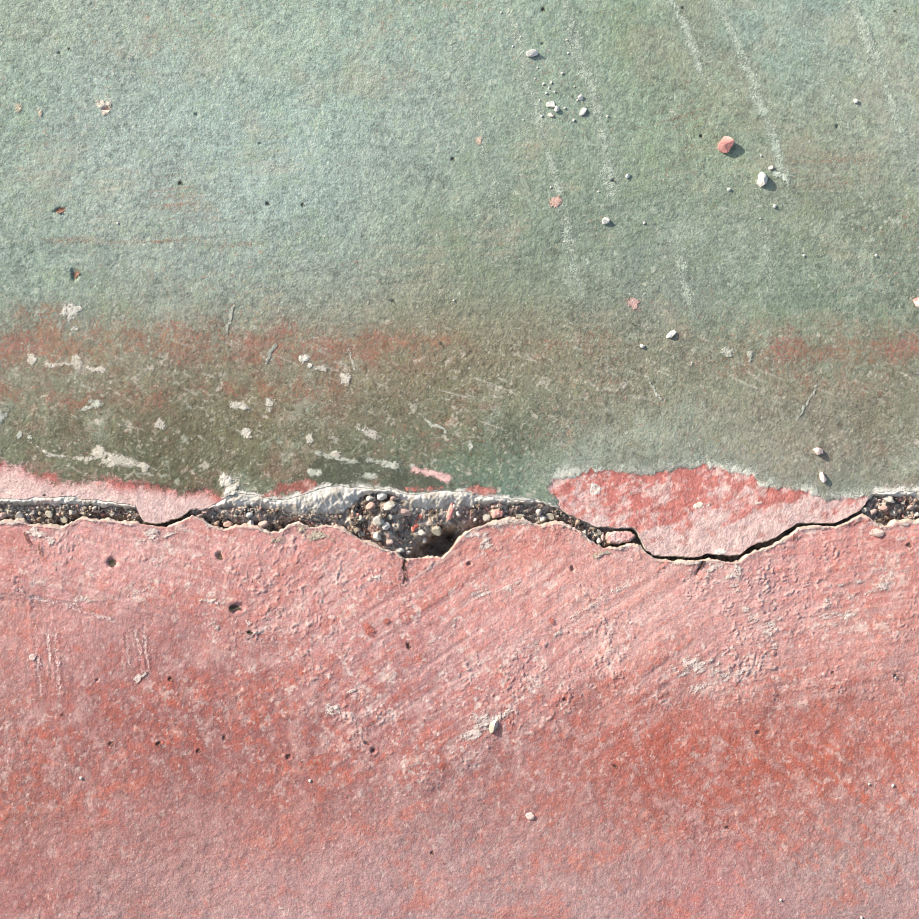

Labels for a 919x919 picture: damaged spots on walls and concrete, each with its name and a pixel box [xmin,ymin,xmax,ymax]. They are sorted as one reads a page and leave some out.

crack [143,510,192,527]
peeling [0,455,919,565]
crack [610,508,862,575]